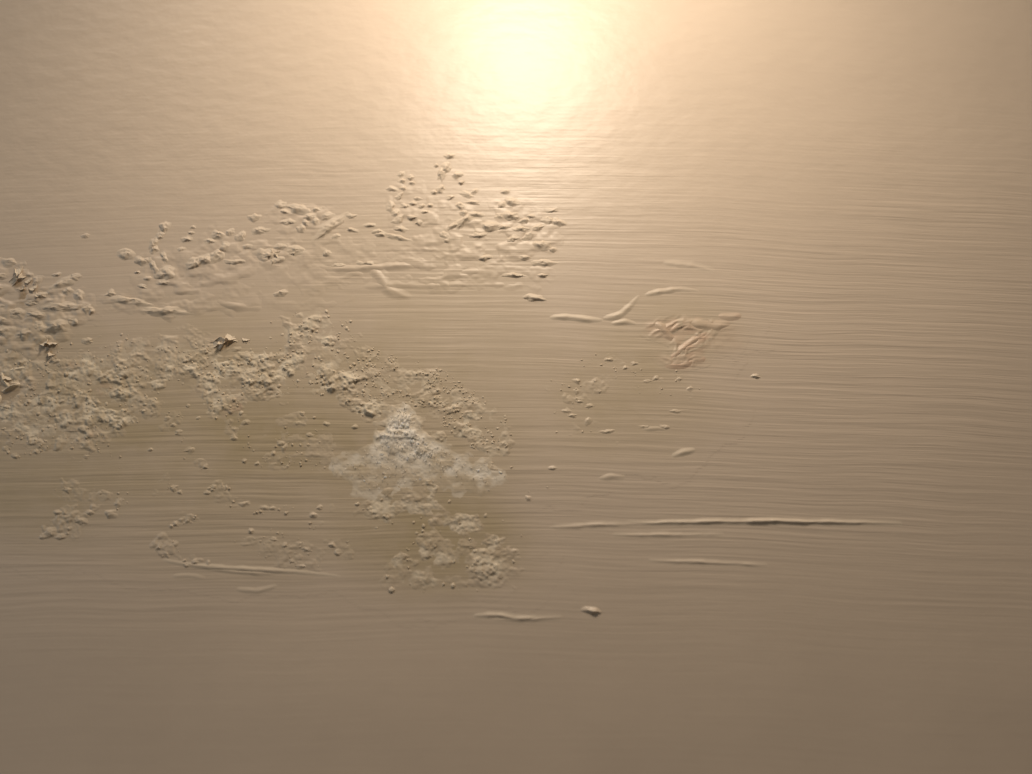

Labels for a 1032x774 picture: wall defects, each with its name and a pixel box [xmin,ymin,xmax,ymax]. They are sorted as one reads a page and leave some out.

peeling [35,335,68,365]
peeling [202,334,249,354]
peeling [0,366,25,405]
water stain [0,191,589,628]
peeling [39,478,128,541]
spalling [353,478,525,601]